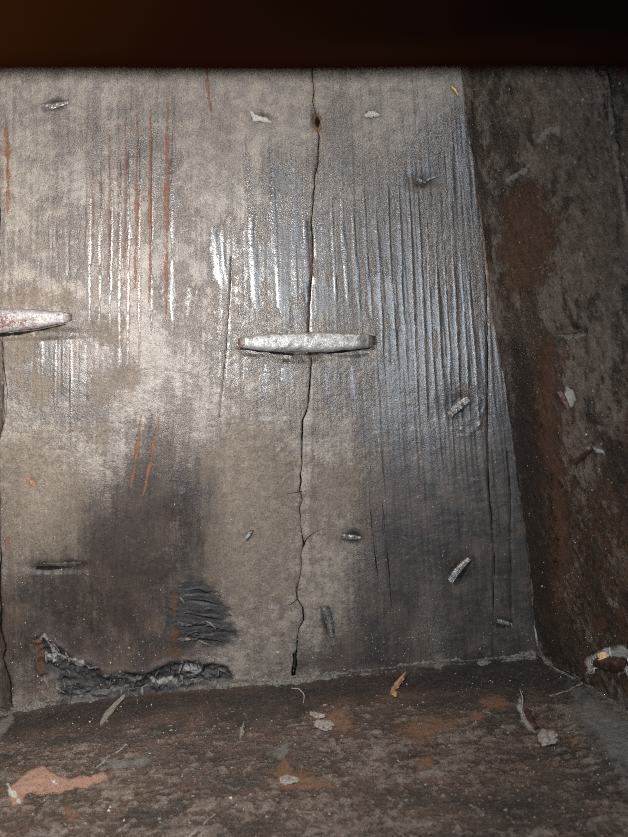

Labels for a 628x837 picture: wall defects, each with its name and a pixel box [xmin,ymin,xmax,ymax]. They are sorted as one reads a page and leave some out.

crack [308,76,322,332]
crack [285,352,323,676]
spalling [33,626,229,704]